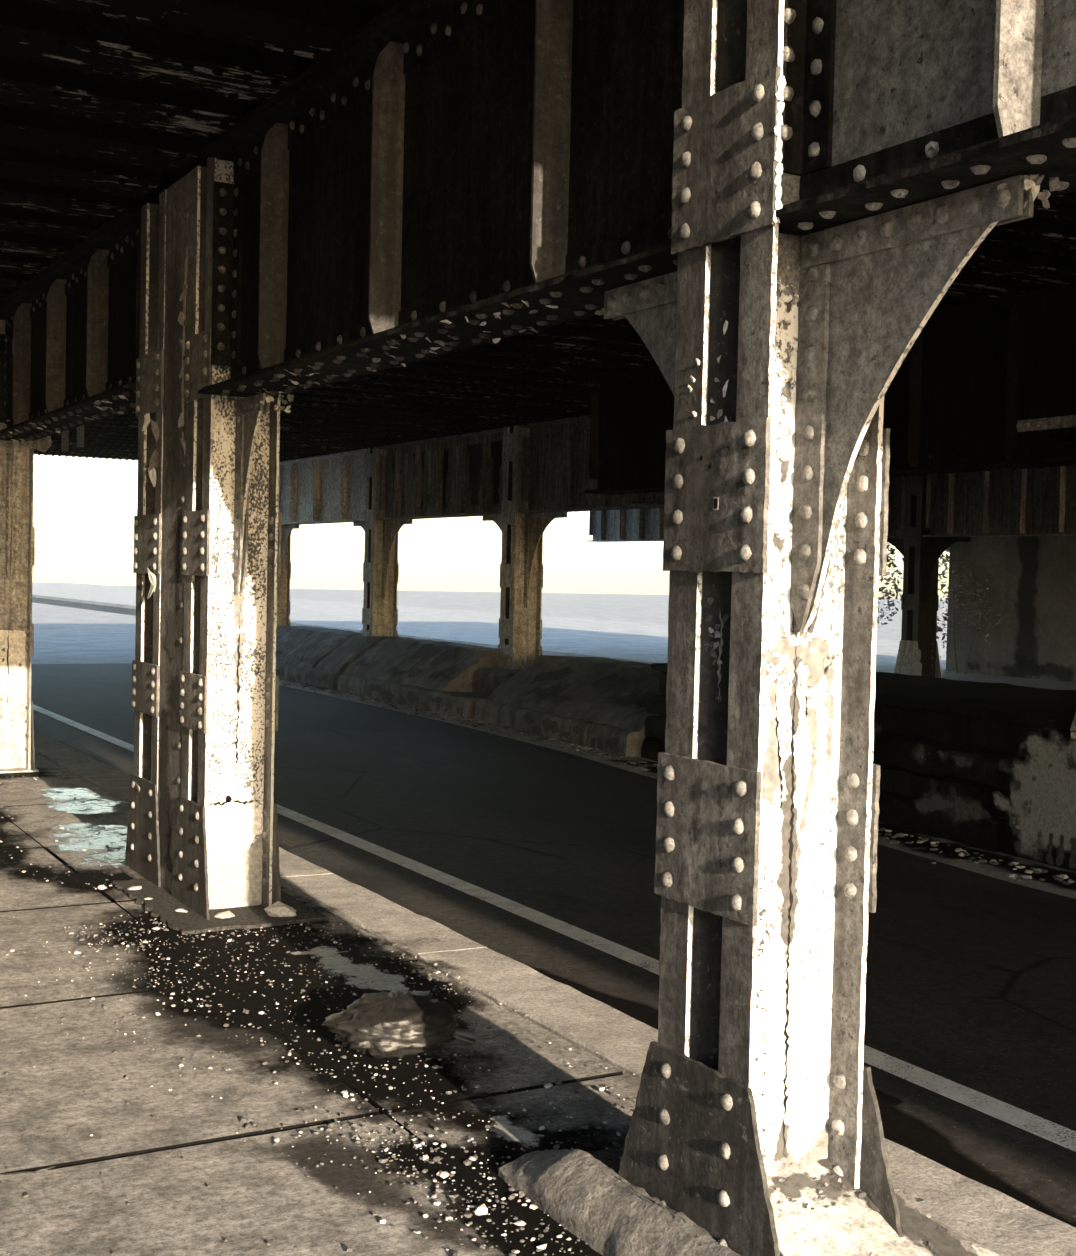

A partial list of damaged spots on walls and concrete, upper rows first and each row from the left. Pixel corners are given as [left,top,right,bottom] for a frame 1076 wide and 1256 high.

water stain [0,767,70,785]
peeling [762,637,836,810]
spalling [913,735,1076,869]
peeling [758,870,778,957]
water stain [0,808,626,1256]
water stain [532,968,658,1030]
water stain [875,1089,1076,1228]